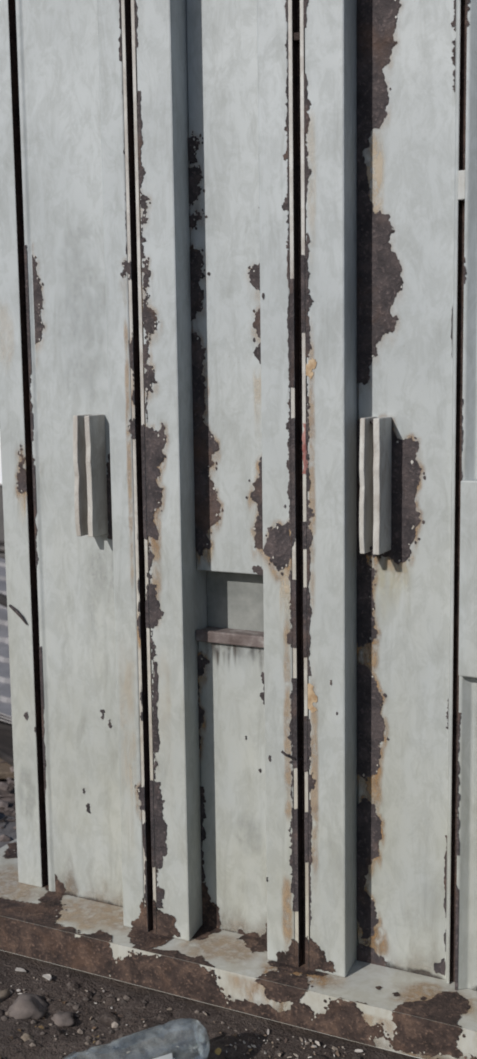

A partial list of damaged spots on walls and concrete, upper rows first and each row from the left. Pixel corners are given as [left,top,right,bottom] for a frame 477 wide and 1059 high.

rust [16,245,45,508]
rust [120,242,131,279]
rust [137,91,159,419]
rust [188,131,207,230]
rust [190,244,223,562]
rust [246,40,314,676]
rust [357,0,403,385]
rust [0,418,477,1059]